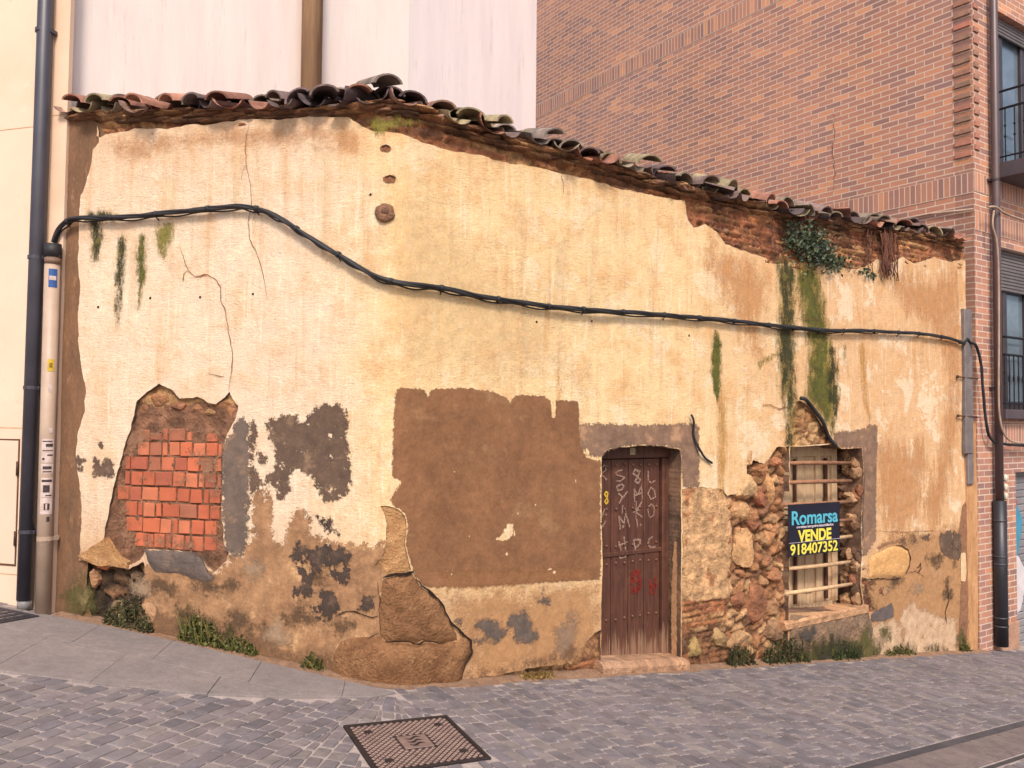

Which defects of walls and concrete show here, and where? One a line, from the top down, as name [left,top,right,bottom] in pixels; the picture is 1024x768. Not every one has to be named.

water stain [89,211,108,261]
water stain [115,223,172,319]
crack [179,246,233,384]
water stain [758,258,840,445]
flaking render [680,196,963,273]
flaking render [75,385,238,626]
water stain [189,550,265,596]
flaking render [681,401,830,665]
water stain [131,578,356,671]